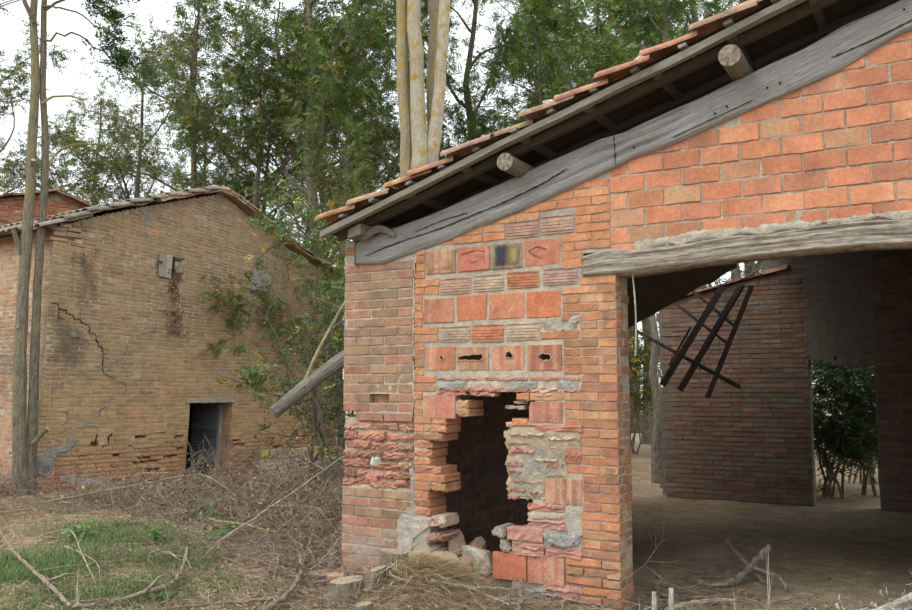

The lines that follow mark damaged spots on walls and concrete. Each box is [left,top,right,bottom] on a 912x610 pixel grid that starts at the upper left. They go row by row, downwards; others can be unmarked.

crack [52,302,156,448]
spalling [505,401,535,410]
spalling [341,421,414,489]
spalling [426,512,460,541]
spalling [492,523,514,552]